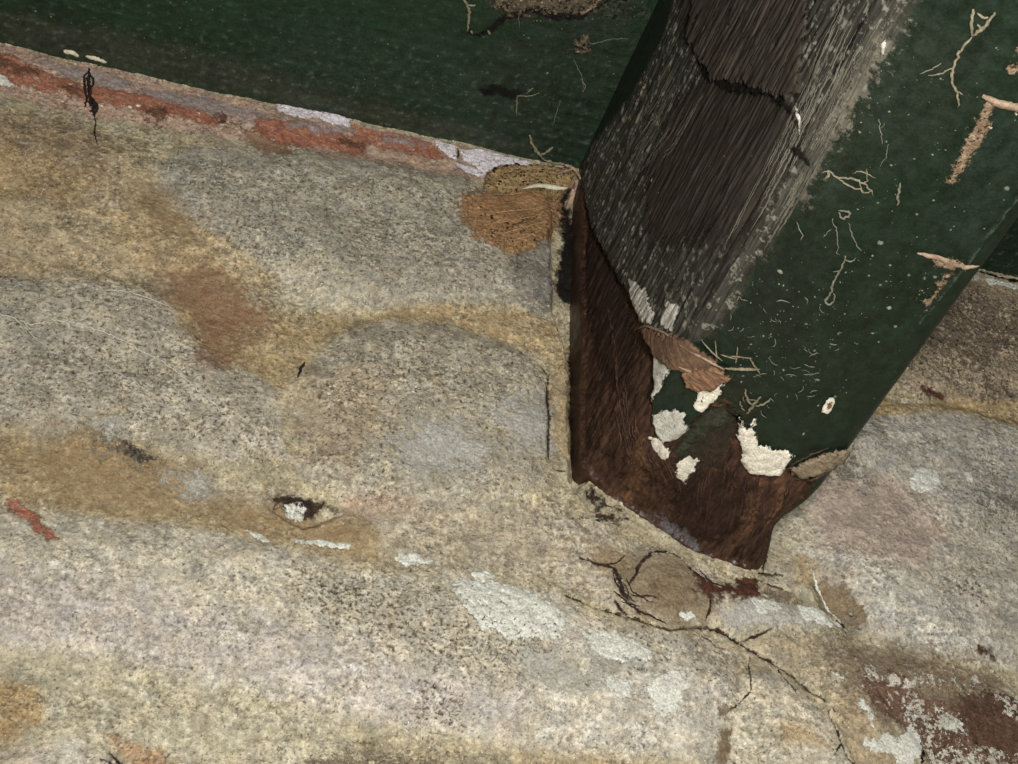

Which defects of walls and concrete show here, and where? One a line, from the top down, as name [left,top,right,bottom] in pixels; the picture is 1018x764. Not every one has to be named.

peeling [628,279,679,331]
peeling [651,357,670,401]
peeling [648,383,725,483]
peeling [736,417,853,479]
peeling [822,398,835,414]
crack [564,595,855,764]